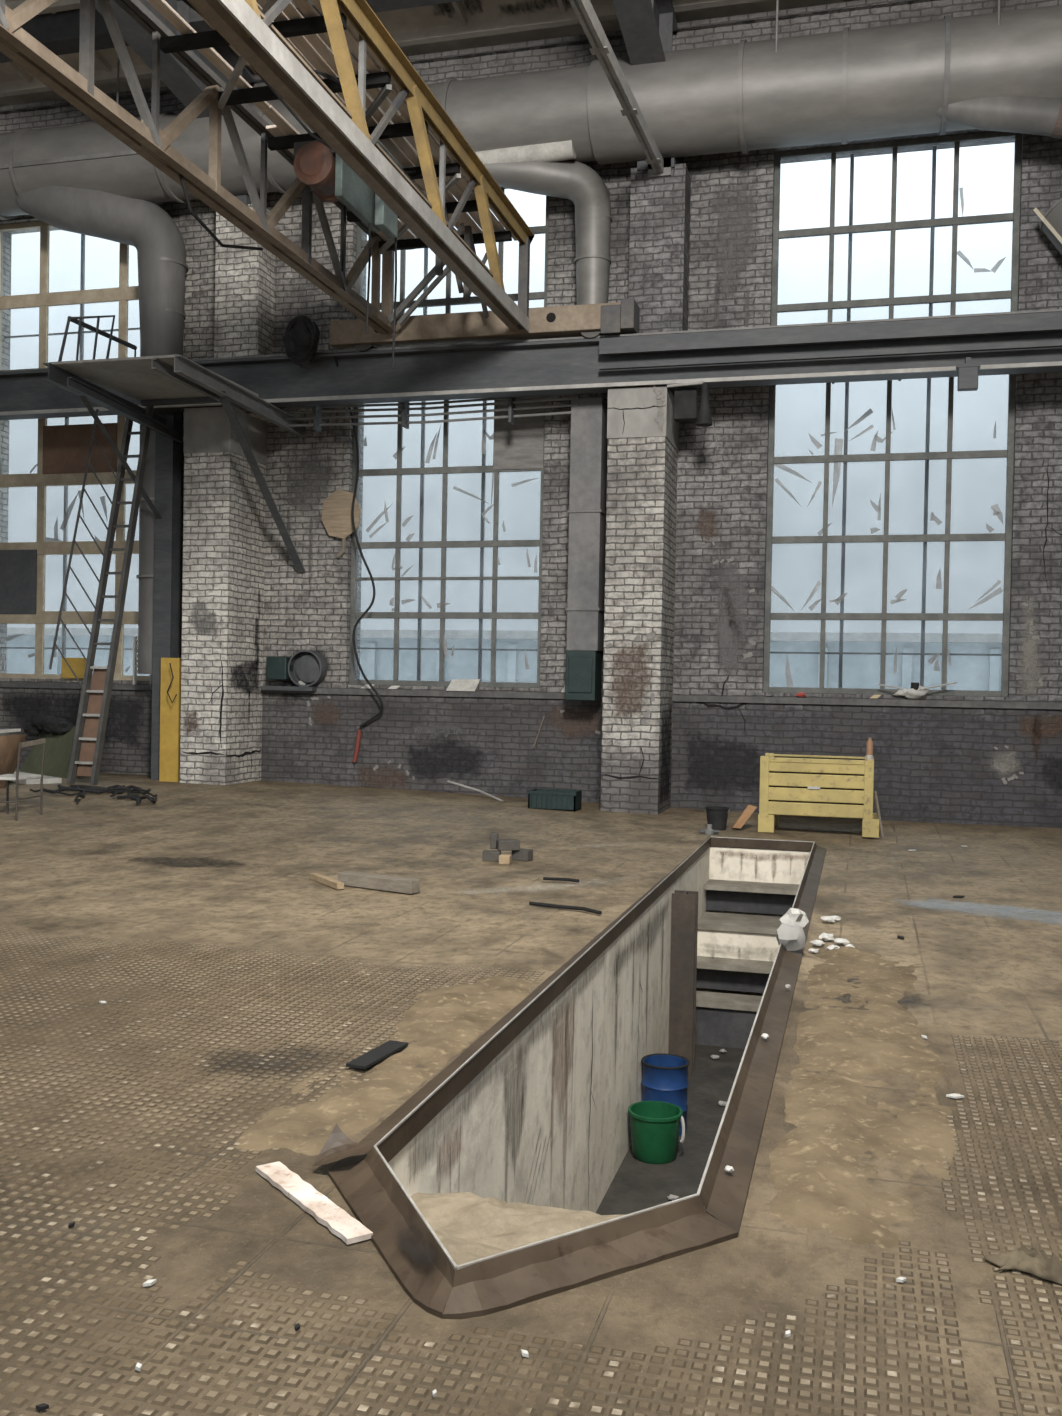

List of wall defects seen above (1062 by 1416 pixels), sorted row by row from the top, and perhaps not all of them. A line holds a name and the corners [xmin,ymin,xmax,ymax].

leakage [413,906,667,1191]